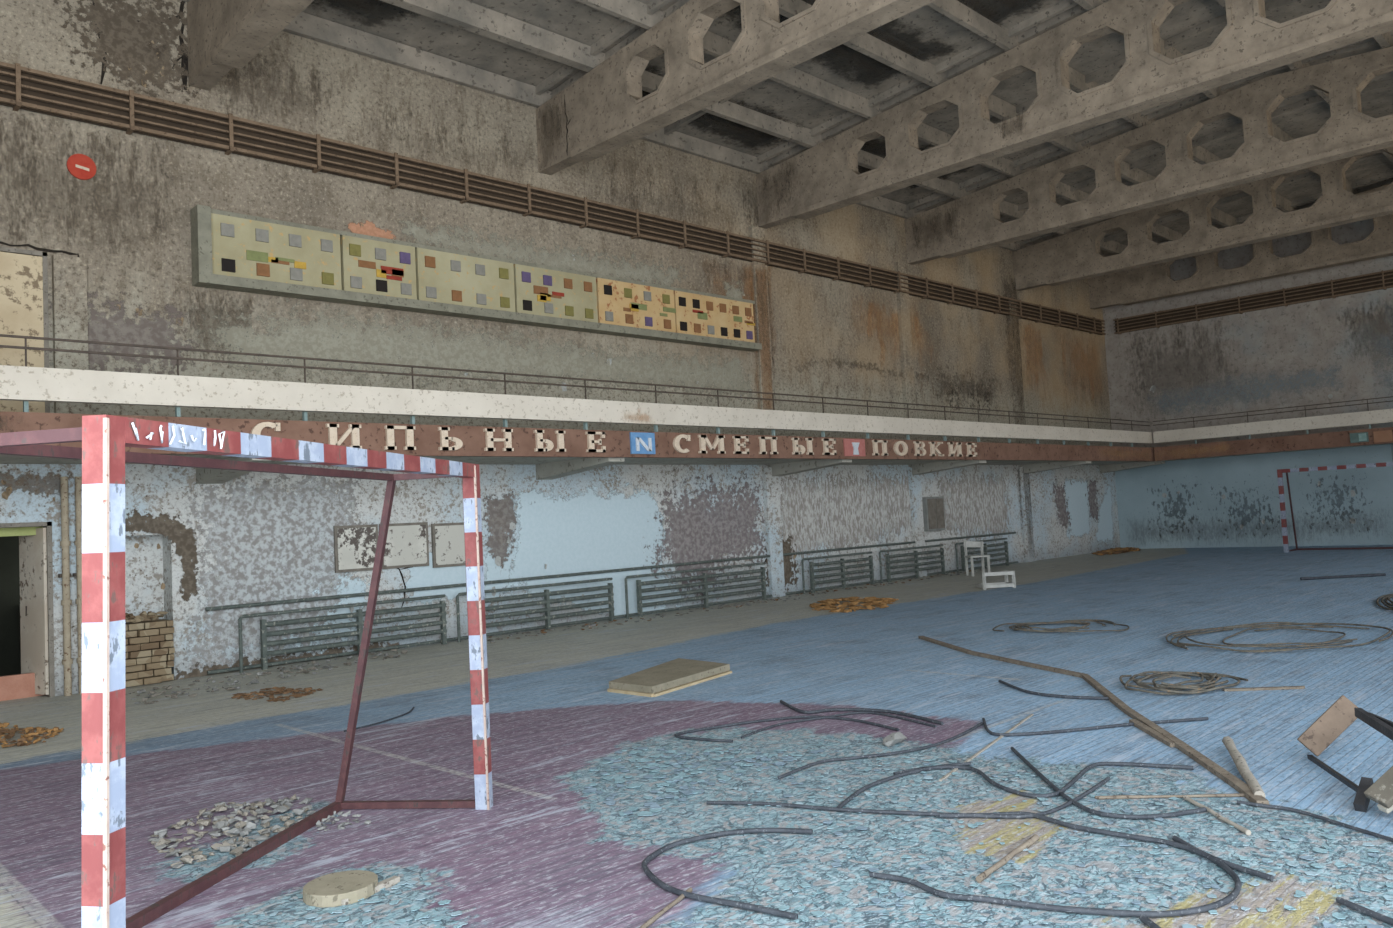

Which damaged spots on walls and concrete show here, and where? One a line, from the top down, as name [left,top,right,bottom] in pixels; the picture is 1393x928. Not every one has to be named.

peeling [125,464,400,680]
peeling [405,552,467,605]
peeling [482,469,912,619]